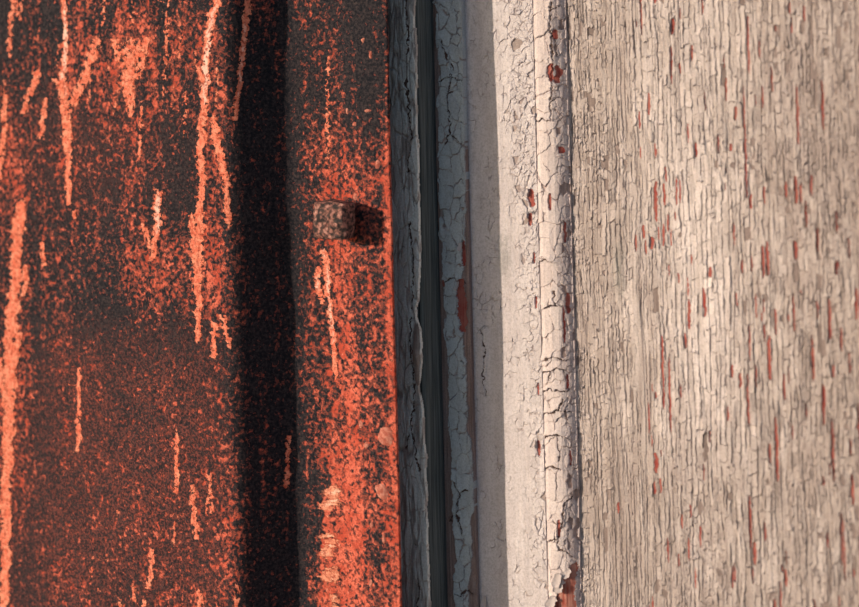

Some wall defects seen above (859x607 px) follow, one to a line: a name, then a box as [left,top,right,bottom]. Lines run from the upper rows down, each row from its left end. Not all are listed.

rust [20,0,152,219]
rust [141,187,164,261]
rust [161,0,232,358]
crack [536,2,559,122]
peeling [635,167,684,254]
peeling [723,58,773,209]
rust [0,198,29,607]
rust [173,428,214,540]
rust [313,245,339,380]
peeling [648,337,682,497]
peeling [730,290,802,424]
peeling [545,561,578,607]